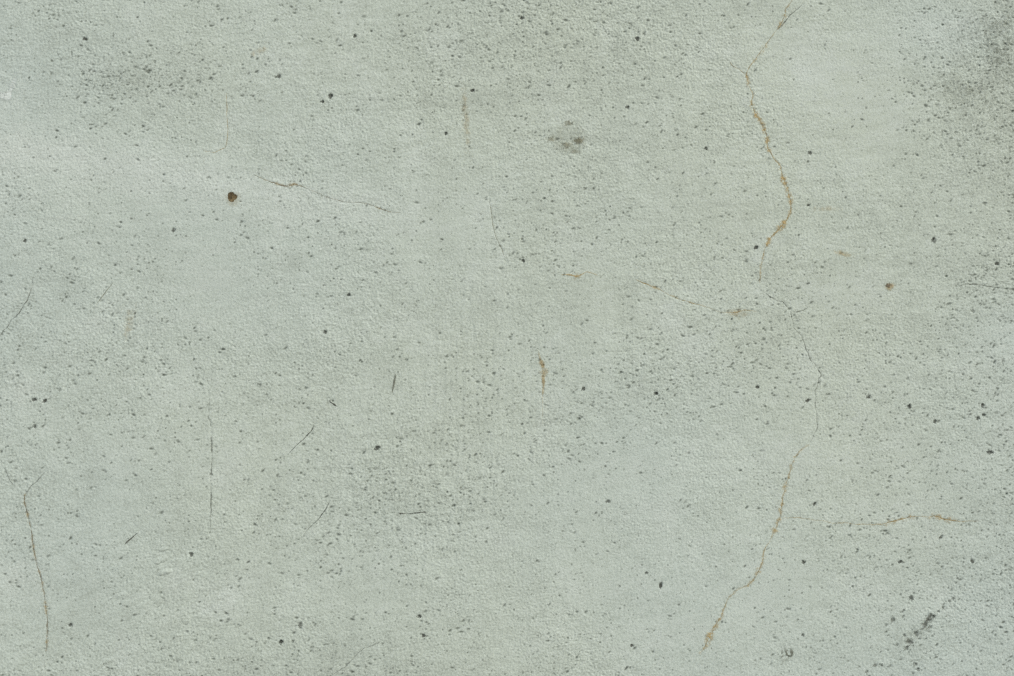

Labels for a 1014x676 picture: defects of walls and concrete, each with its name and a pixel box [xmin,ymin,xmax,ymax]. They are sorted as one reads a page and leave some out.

crack [732,65,791,245]